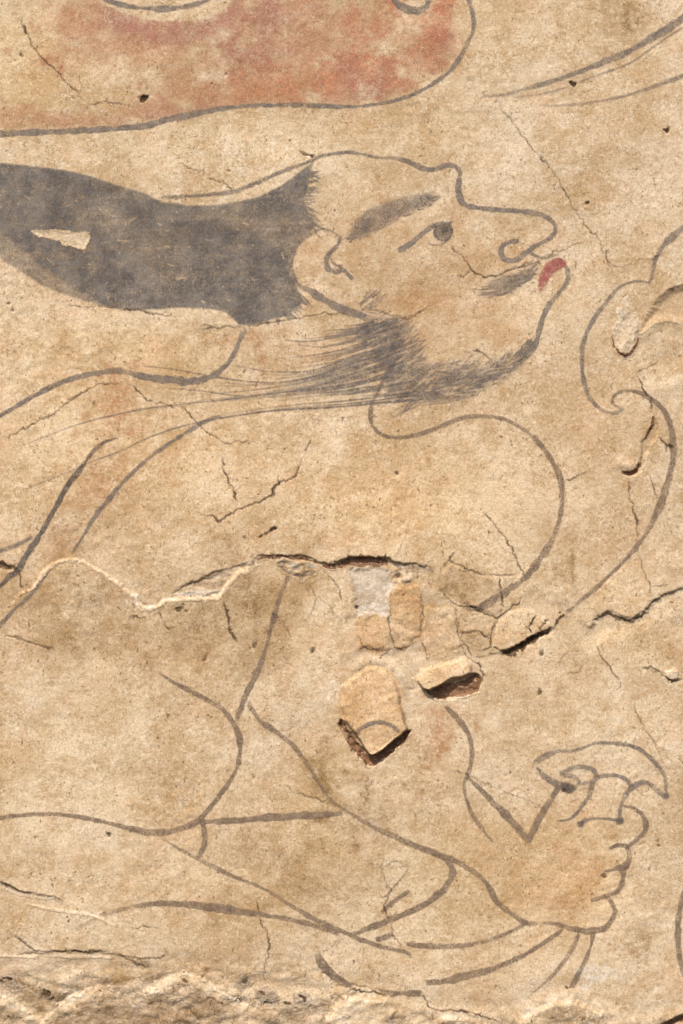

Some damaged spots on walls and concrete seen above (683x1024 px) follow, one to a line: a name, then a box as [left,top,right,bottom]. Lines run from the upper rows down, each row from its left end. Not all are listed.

crack [134,387,309,522]
crack [0,560,22,587]
crack [445,515,564,676]
flaking render [0,953,384,1024]
flaking render [435,1009,487,1023]
flaking render [513,987,610,1024]
flaking render [663,1014,683,1024]